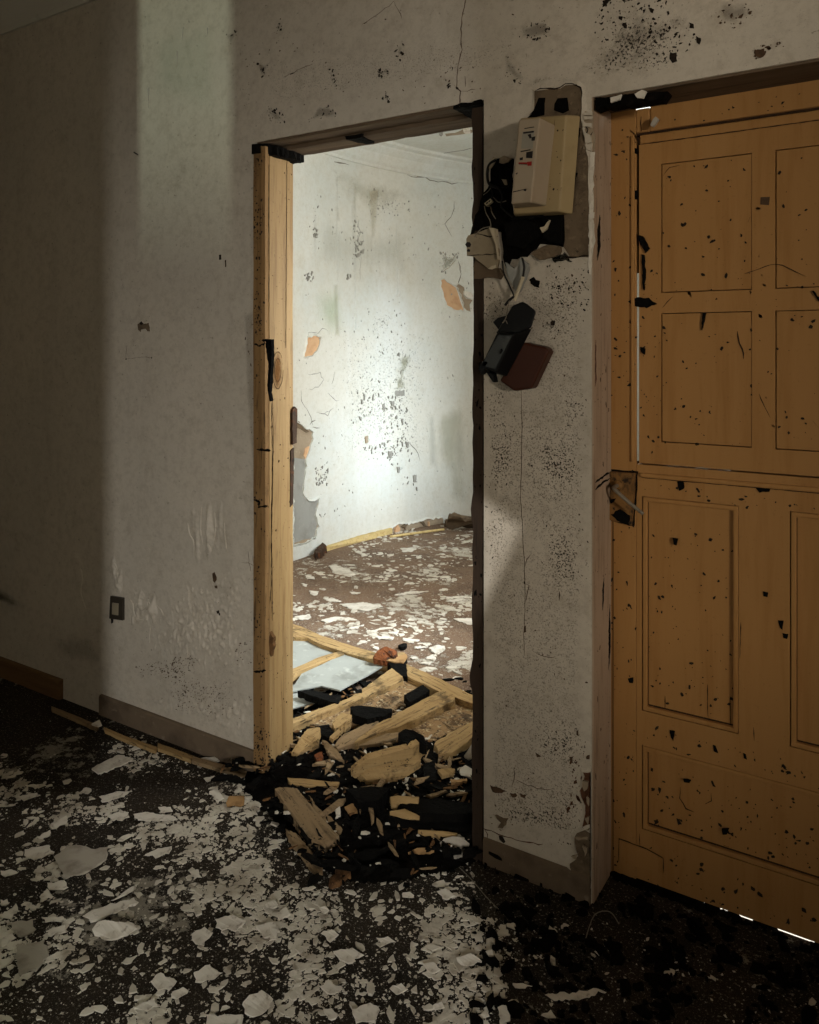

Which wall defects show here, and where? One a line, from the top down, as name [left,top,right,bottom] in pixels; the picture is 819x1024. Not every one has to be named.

crack [452,0,475,103]
spalling [462,81,672,296]
flaking render [404,226,482,318]
peeling [299,301,444,495]
flaking render [293,414,342,547]